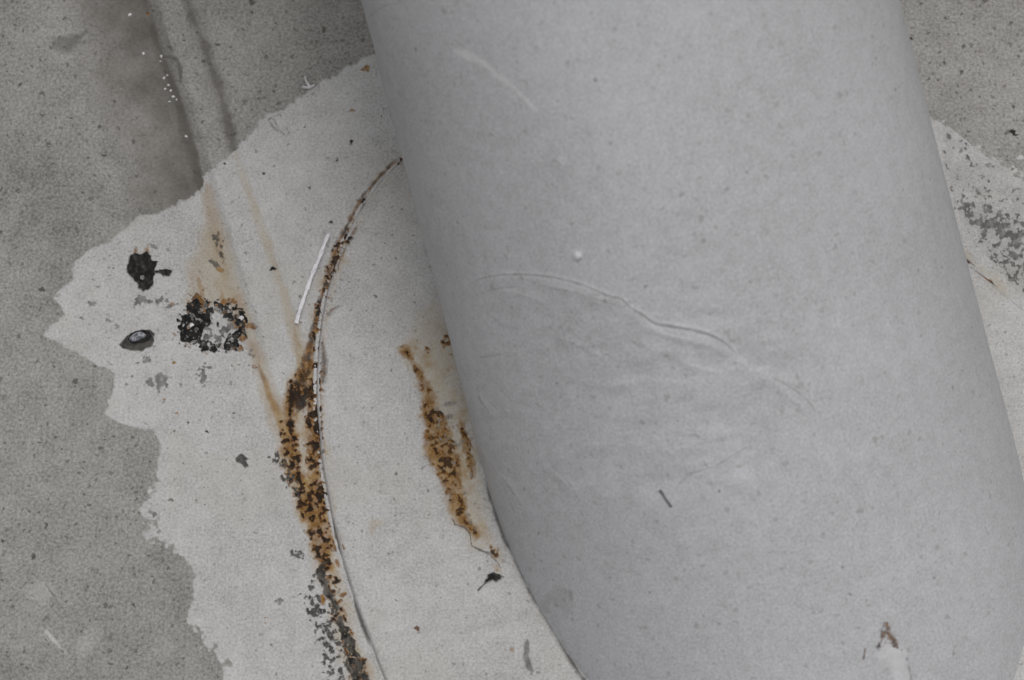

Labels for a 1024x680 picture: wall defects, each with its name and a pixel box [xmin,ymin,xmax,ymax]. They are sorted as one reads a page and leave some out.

peeling [130,355,173,394]
spalling [107,243,258,385]
peeling [208,231,224,273]
spalling [235,453,249,468]
rust [171,149,405,680]
rust [395,290,505,568]
peeling [934,125,1024,297]
peeling [509,638,535,676]